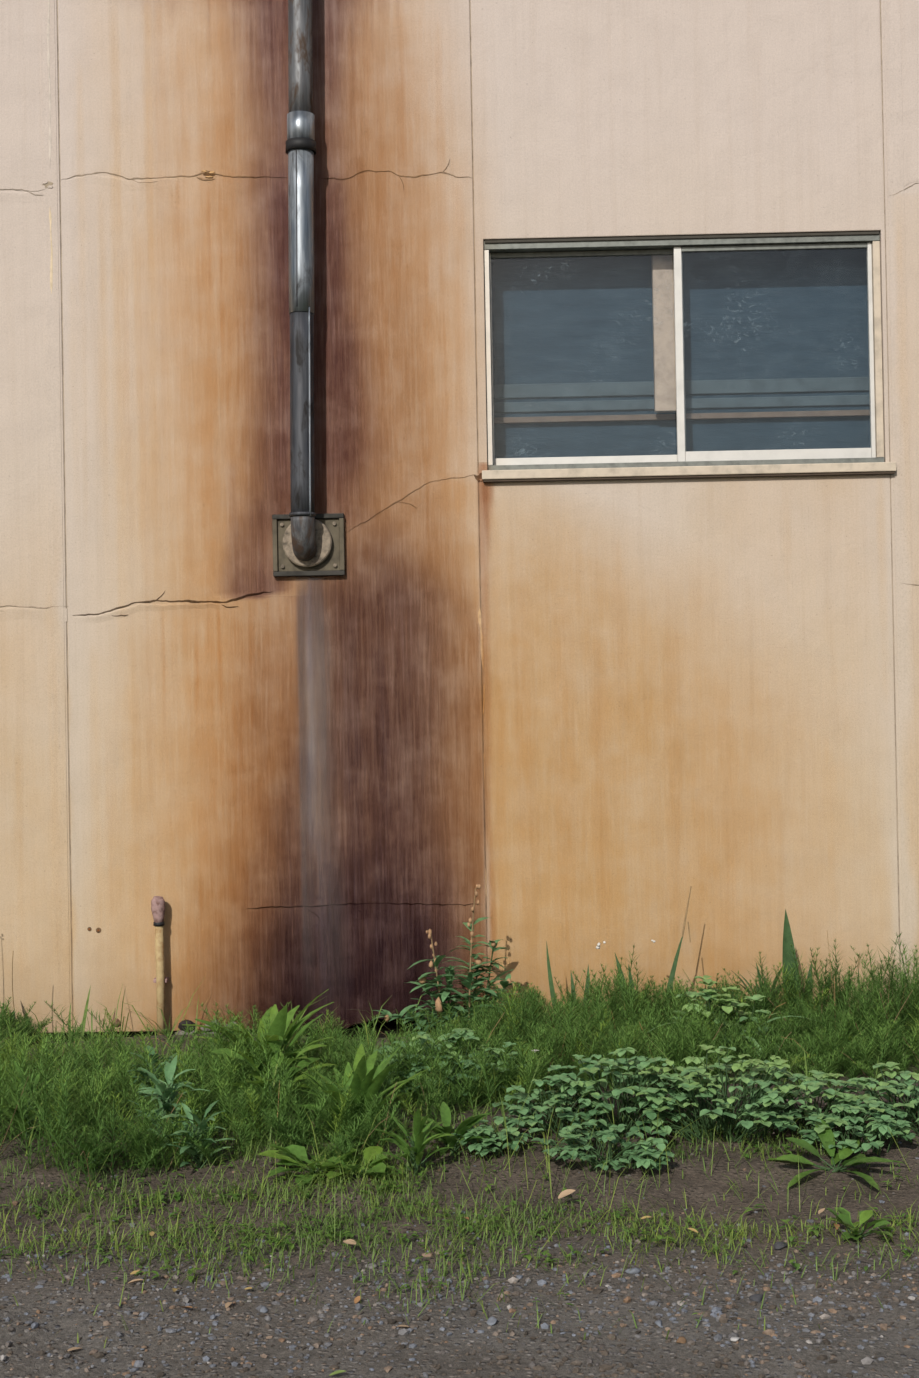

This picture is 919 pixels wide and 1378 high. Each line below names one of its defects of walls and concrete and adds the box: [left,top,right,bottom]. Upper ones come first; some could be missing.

crack [0,172,286,203]
crack [319,159,471,188]
crack [347,474,475,532]
crack [0,591,272,623]